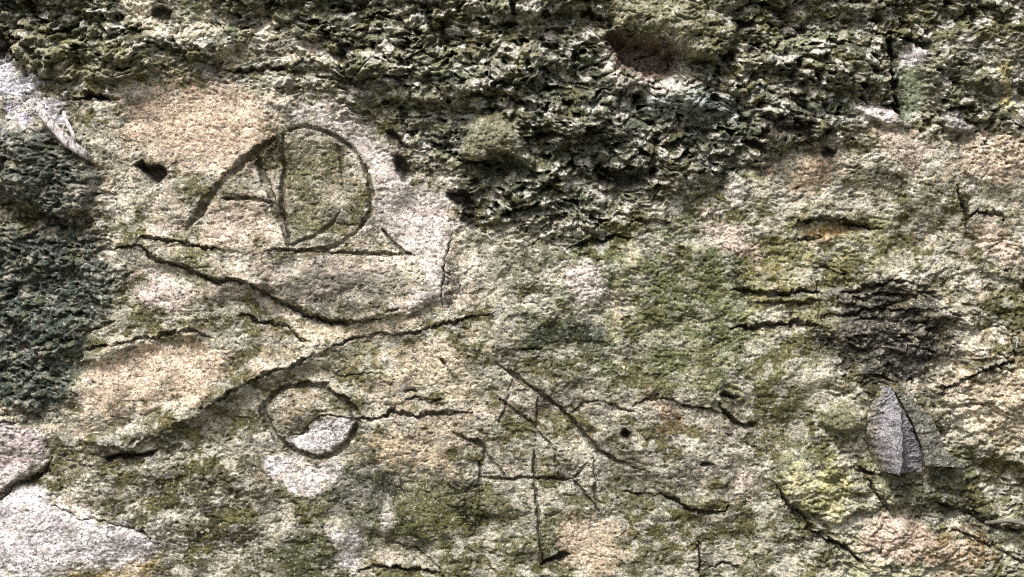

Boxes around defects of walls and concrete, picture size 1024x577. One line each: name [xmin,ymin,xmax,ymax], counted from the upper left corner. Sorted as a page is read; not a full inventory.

crack [136,235,487,403]
crack [362,358,468,421]